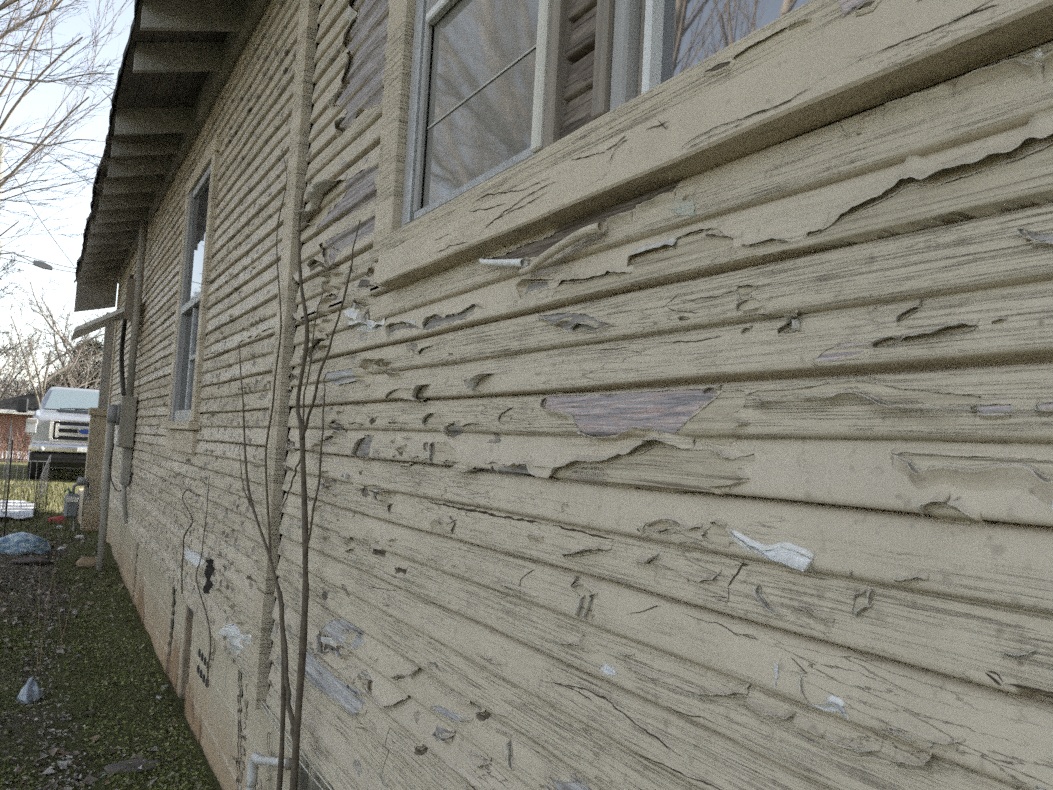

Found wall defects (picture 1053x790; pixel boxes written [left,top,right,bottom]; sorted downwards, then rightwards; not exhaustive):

peeling [327,0,390,139]
crack [872,1,998,54]
crack [572,87,811,163]
crack [435,177,553,252]
peeling [482,108,1053,335]
peeling [286,167,487,397]
peeling [326,298,1017,495]
peeling [890,447,1053,525]
peeling [636,514,816,573]
crack [541,680,720,790]
peeling [600,649,968,777]
crack [985,671,1053,694]